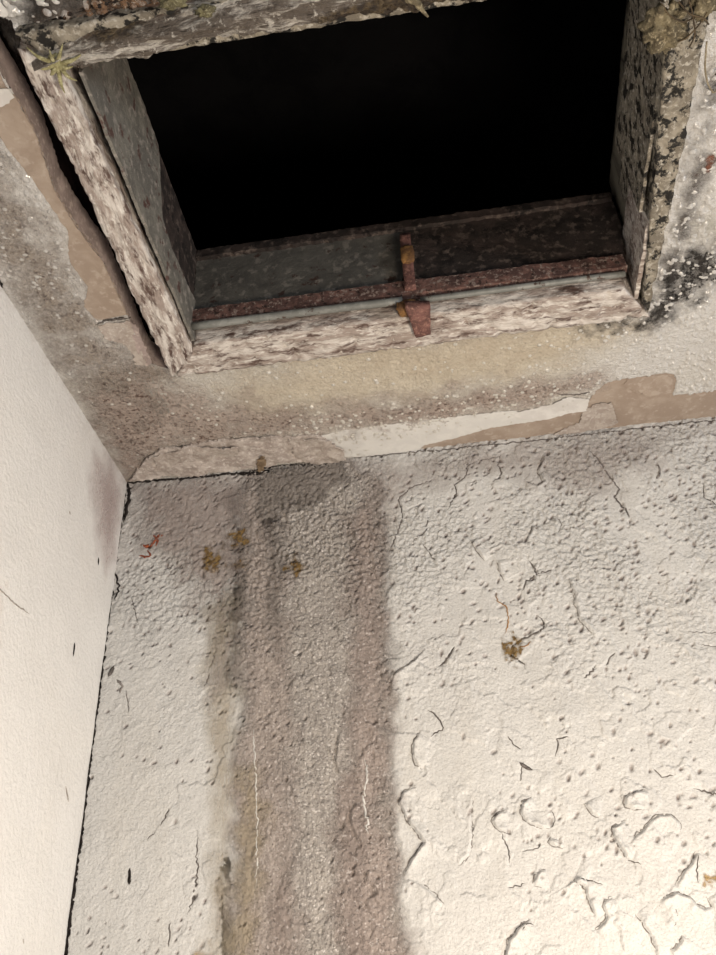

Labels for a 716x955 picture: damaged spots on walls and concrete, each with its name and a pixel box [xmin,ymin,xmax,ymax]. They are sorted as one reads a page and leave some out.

rust [78,0,160,17]
peeling [0,74,152,366]
damp [0,160,716,469]
peeling [129,373,716,482]
crack [471,530,551,590]
crack [355,420,716,560]
crack [64,463,328,955]
damp [147,458,407,955]
crack [389,647,455,697]
crack [510,615,545,665]